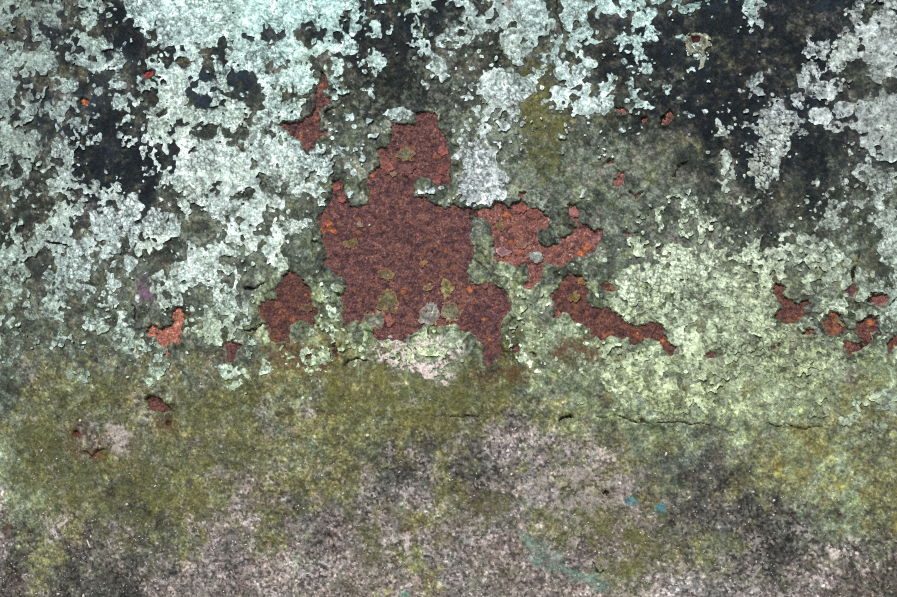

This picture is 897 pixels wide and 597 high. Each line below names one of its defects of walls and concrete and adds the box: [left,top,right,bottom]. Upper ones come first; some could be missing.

corrosion [281,74,331,151]
peeling [0,0,712,400]
corrosion [318,110,677,366]
peeling [501,0,897,439]
corrosion [258,271,319,344]
corrosion [774,283,810,324]
corrosion [867,294,889,307]
corrosion [148,308,185,356]
corrosion [803,312,879,356]
damp [585,447,616,462]
damp [382,533,413,568]
damp [826,536,879,576]